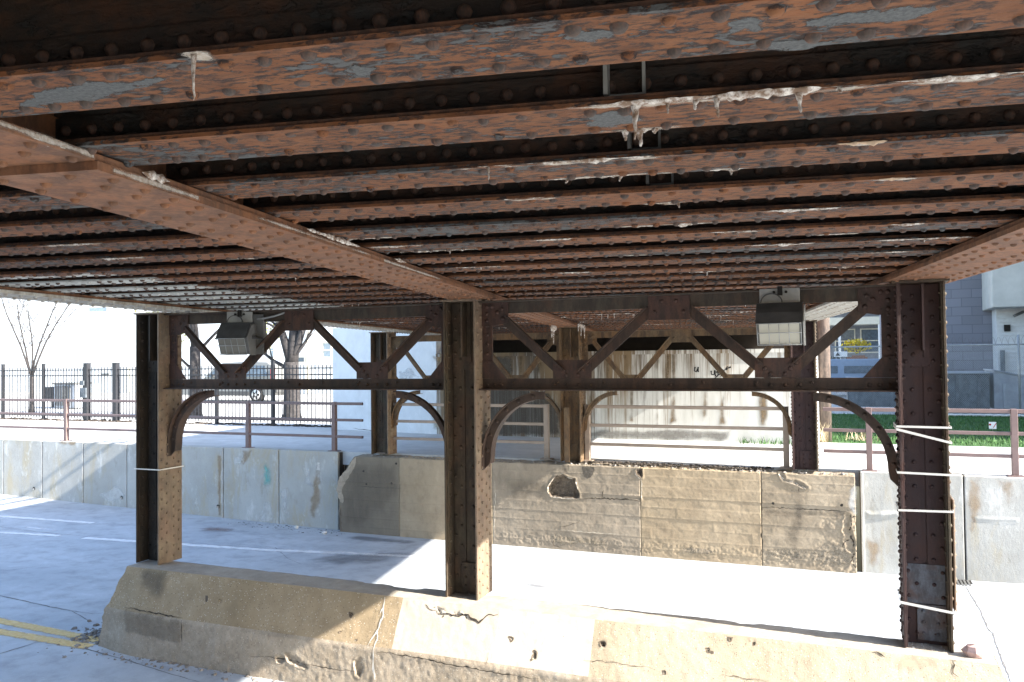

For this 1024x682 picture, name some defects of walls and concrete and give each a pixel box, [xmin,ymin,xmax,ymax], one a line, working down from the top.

peeling [19,77,169,108]
leakage [183,51,210,100]
leakage [897,72,1024,84]
leakage [480,84,863,180]
spalling [336,458,356,528]
spalling [547,475,580,499]
crack [368,599,538,679]